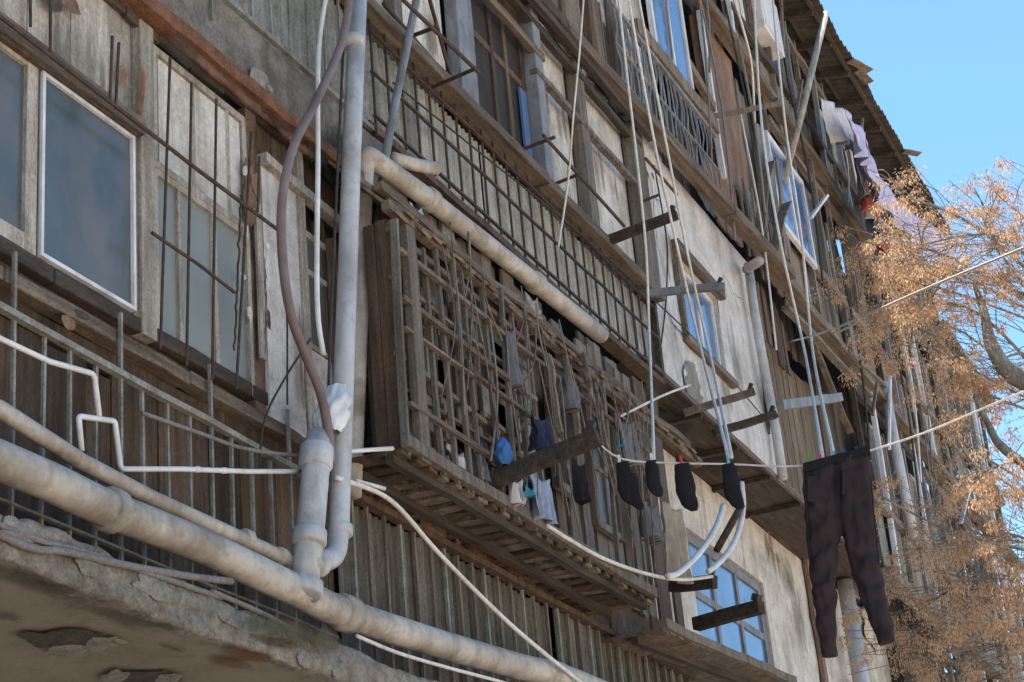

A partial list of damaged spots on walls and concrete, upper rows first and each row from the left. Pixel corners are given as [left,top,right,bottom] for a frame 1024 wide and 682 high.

corrosion [197,56,261,114]
spalling [0,514,439,682]